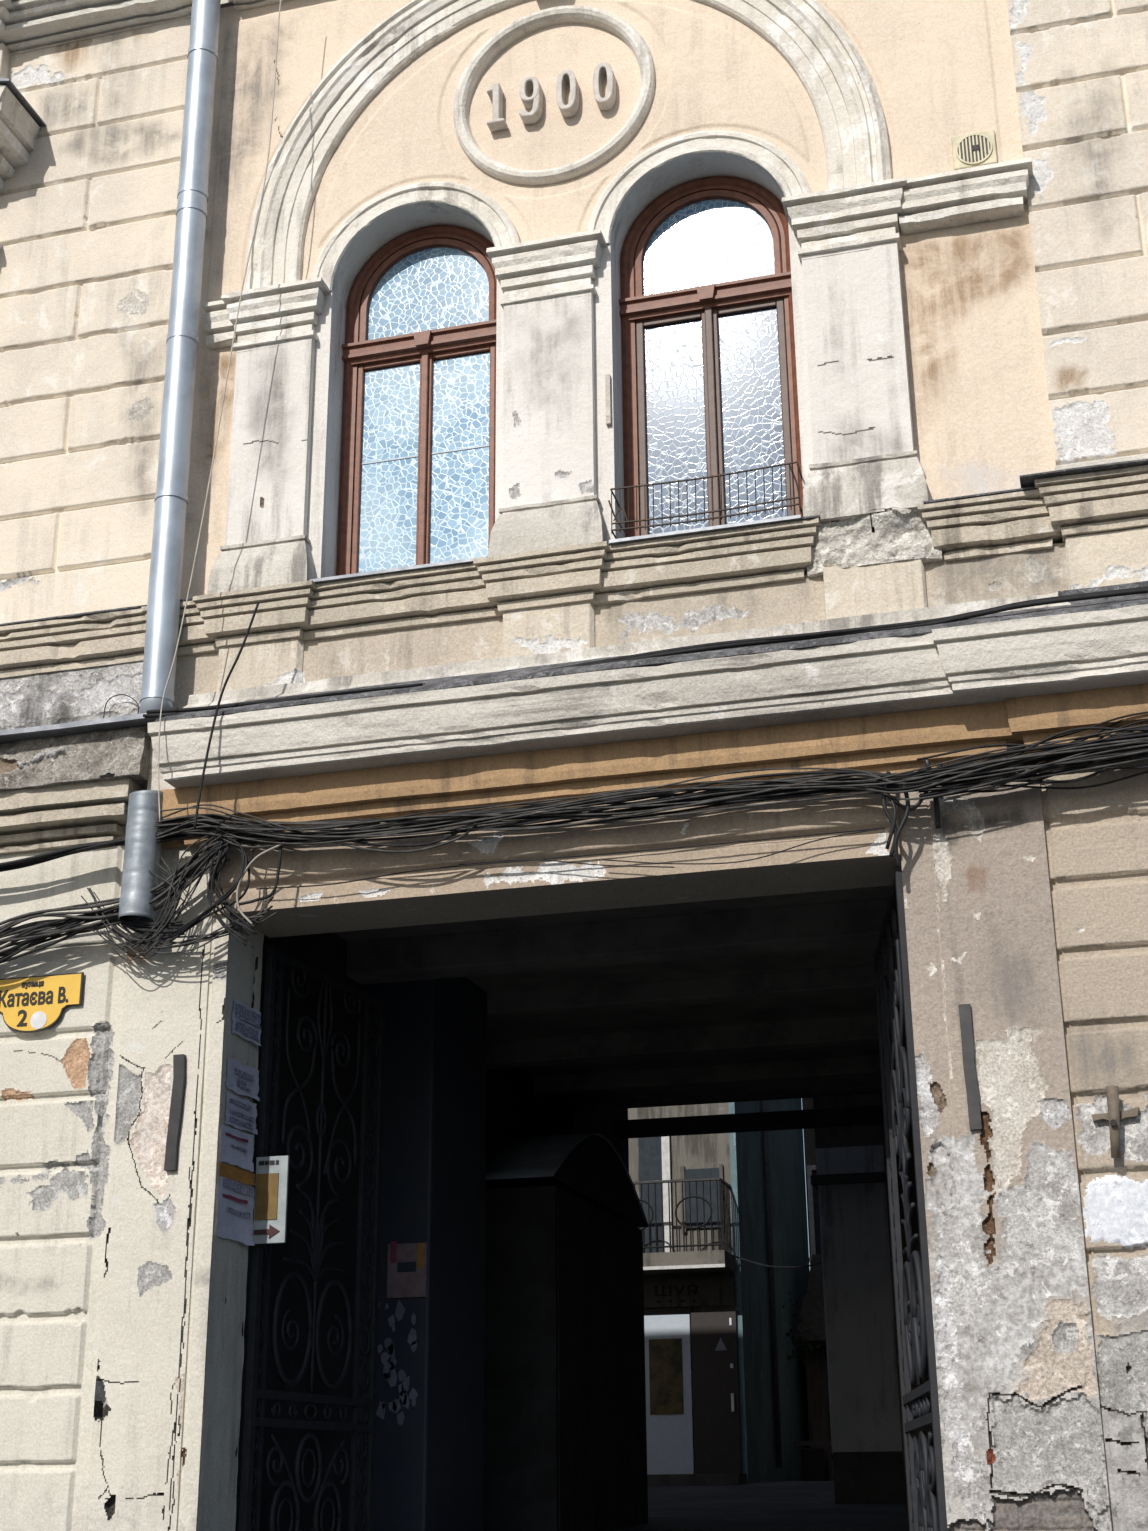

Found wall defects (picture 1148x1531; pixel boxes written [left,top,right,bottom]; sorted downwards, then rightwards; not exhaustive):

peeling [1052,400,1117,465]
spalling [809,508,935,568]
peeling [618,602,753,643]
spalling [0,670,142,730]
spalling [0,745,68,775]
peeling [483,860,606,889]
peeling [924,952,967,976]
peeling [0,1021,176,1239]
crack [96,945,225,1531]
peeling [137,1261,172,1297]
spalling [915,1025,1148,1531]
crack [985,1385,1148,1499]